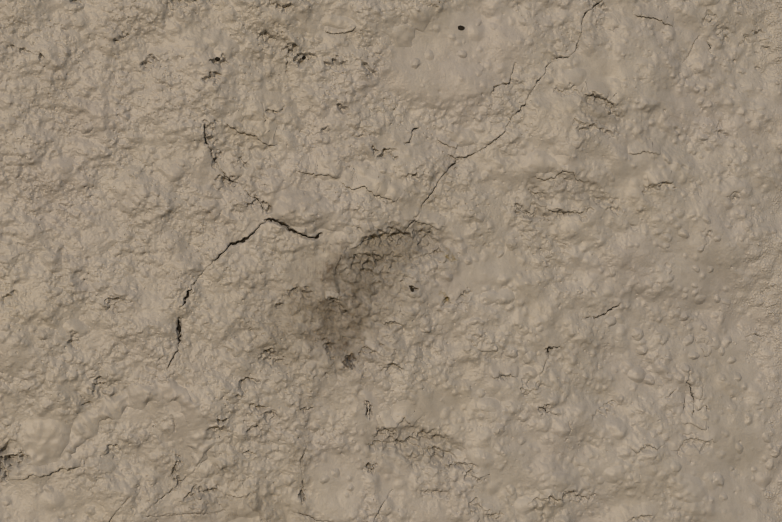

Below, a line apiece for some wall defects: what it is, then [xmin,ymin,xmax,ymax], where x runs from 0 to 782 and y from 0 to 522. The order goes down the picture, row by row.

crack [166,126,320,382]